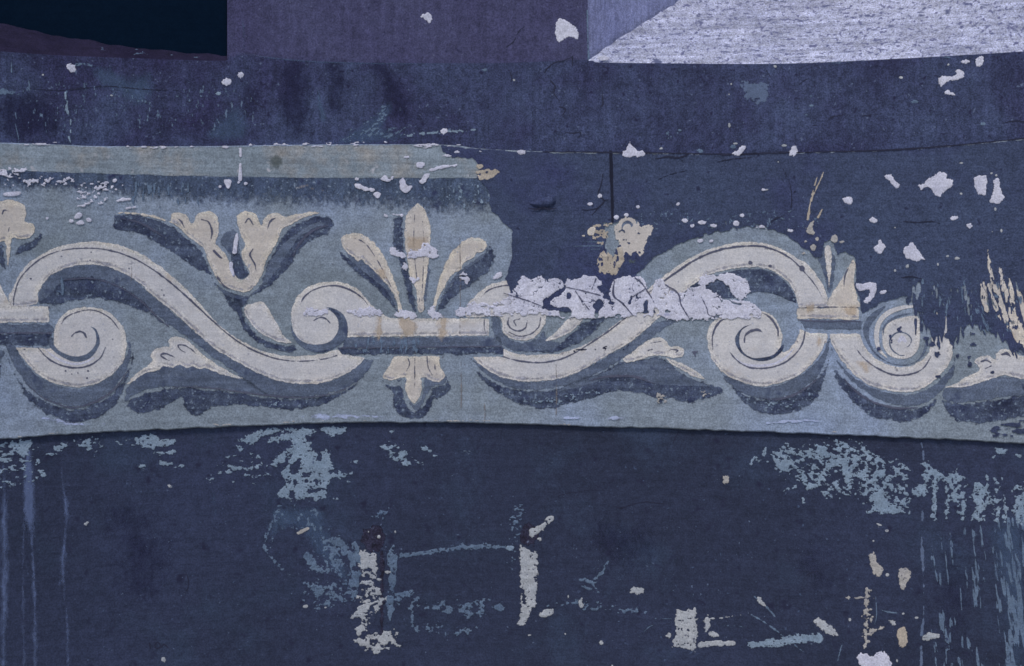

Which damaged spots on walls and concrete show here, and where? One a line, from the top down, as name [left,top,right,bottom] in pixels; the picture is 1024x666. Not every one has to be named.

crack [542,56,1024,223]
peeling [0,167,199,225]
peeling [918,172,962,197]
peeling [974,172,1005,211]
peeling [455,272,761,321]
peeling [894,242,1024,347]
peeling [206,420,358,502]
peeling [347,507,505,654]
peeling [665,584,735,651]
peeling [750,431,1024,666]